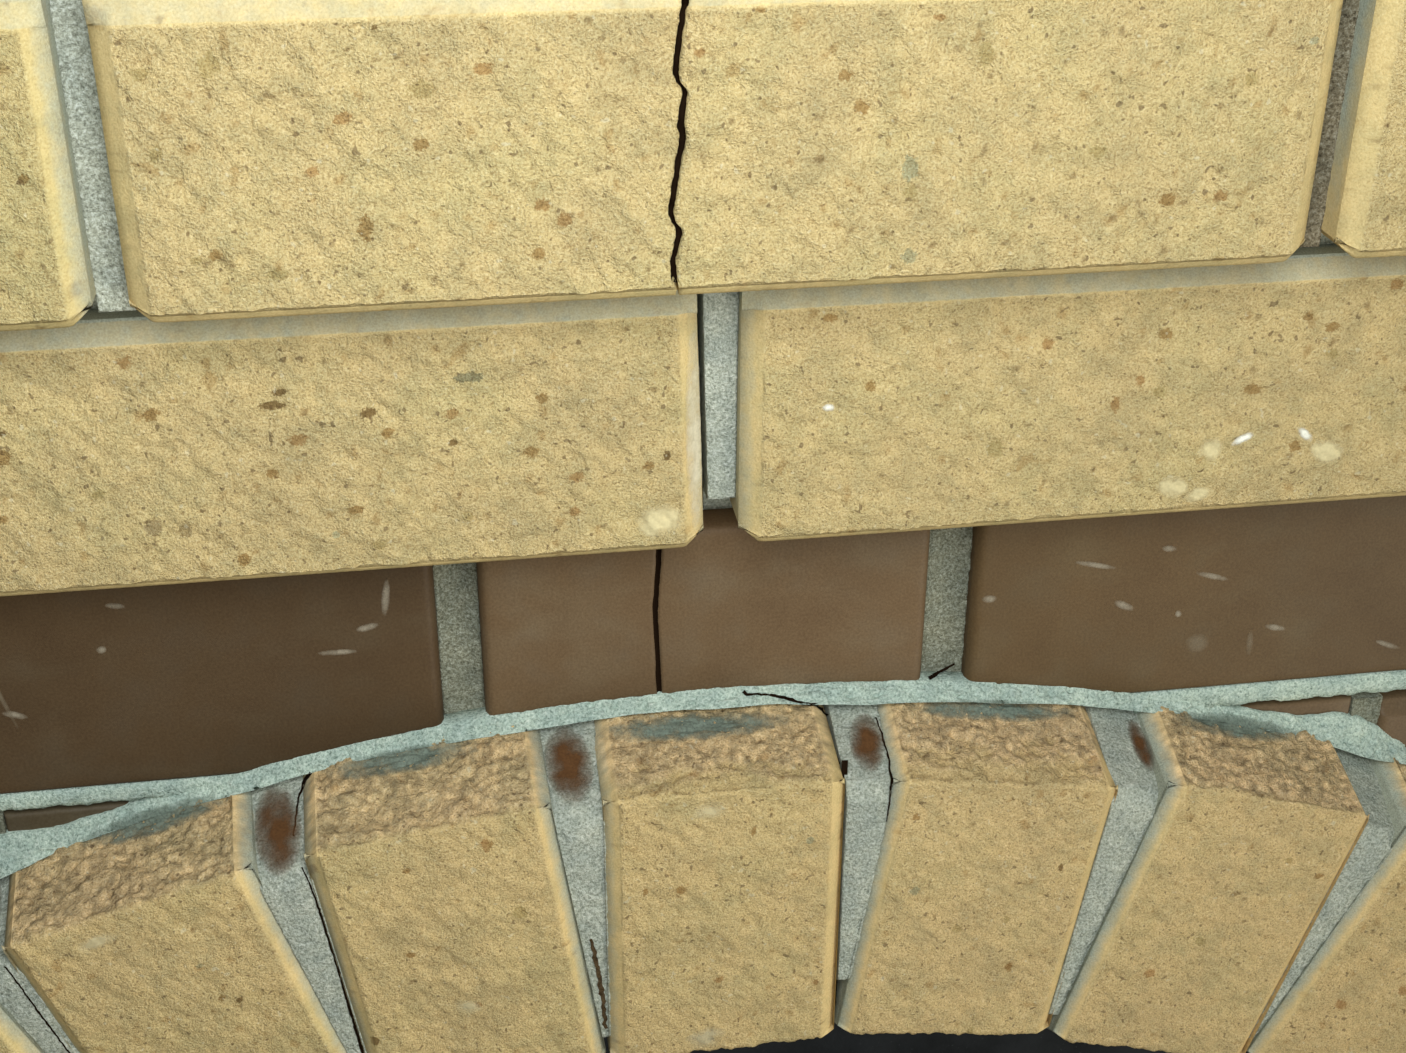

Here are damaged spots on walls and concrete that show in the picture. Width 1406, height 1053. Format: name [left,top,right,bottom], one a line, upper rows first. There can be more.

crack [668,0,704,508]
crack [652,549,662,692]
crack [742,690,829,716]
rust [552,738,587,792]
crack [835,750,848,778]
rust [854,724,880,764]
rust [1131,726,1151,765]